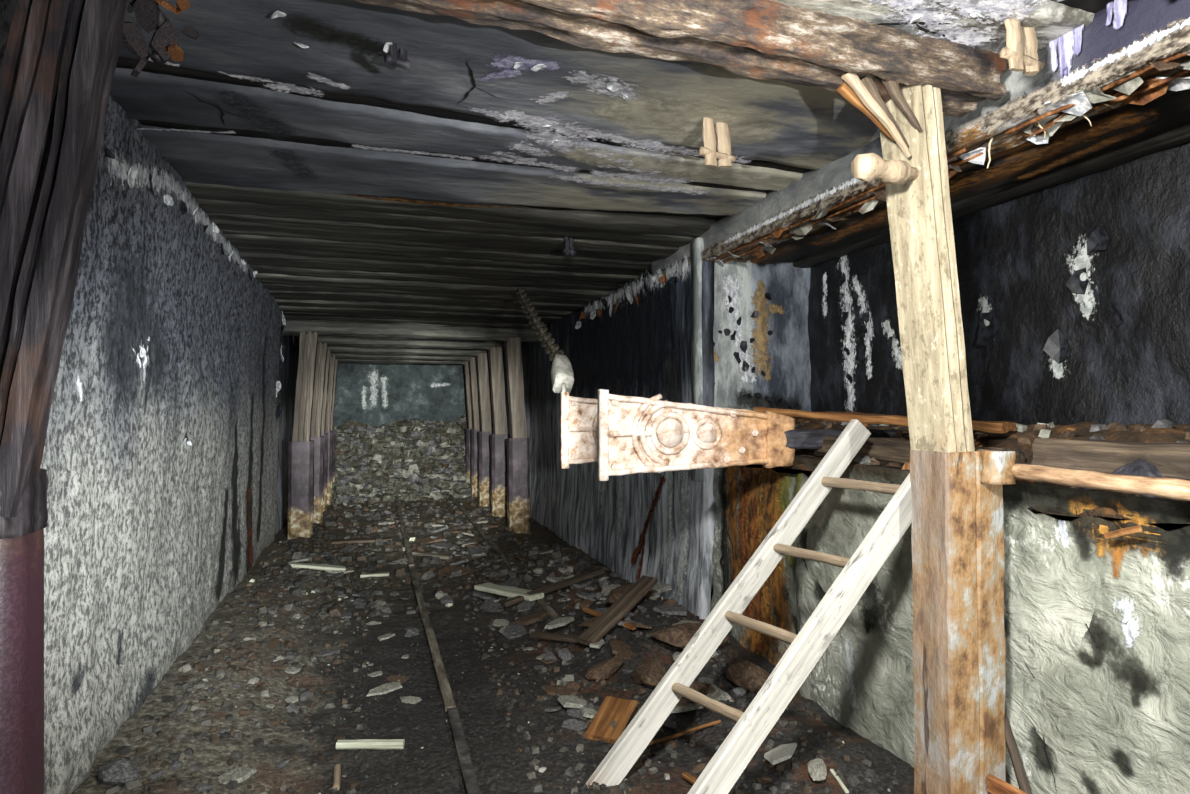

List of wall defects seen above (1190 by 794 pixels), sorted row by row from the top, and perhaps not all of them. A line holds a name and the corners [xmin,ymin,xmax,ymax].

crack [457,61,498,105]
efflorescence [822,255,874,412]
rust [1071,501,1096,515]
rust [1092,502,1161,578]
water stain [1077,600,1160,706]
water stain [1031,727,1053,773]
water stain [1082,774,1099,794]
water stain [1113,749,1133,776]